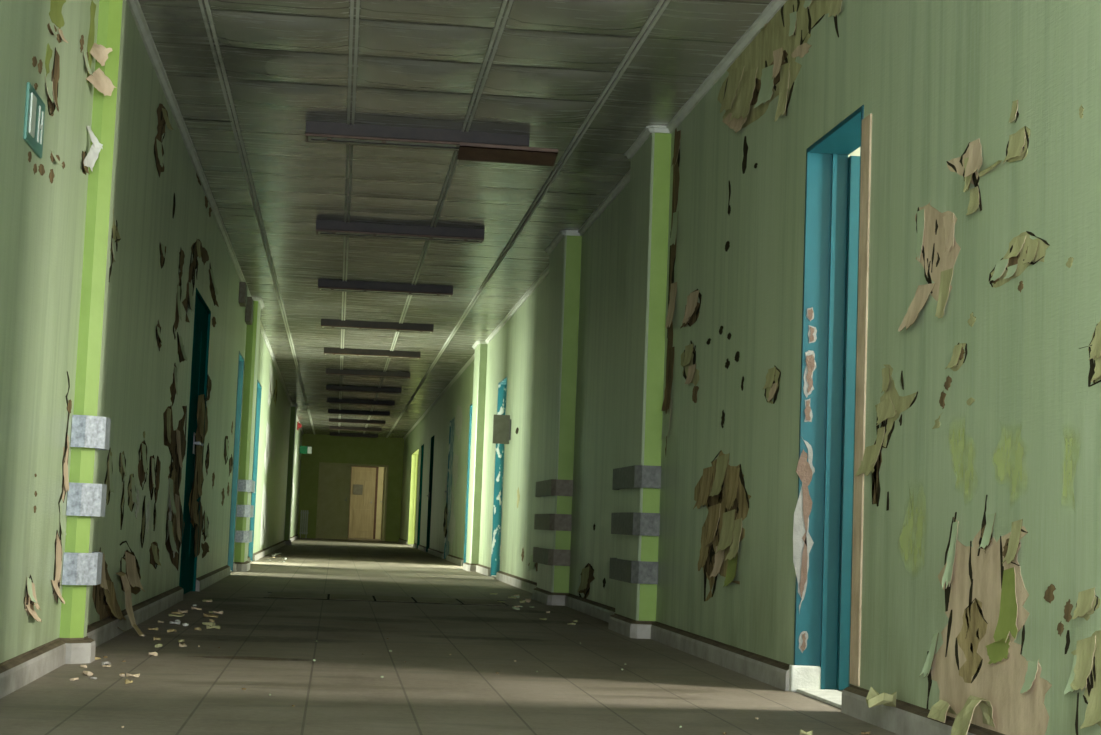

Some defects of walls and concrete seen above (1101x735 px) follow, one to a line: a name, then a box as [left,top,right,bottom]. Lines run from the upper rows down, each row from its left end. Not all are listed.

peeling [32,0,116,116]
peeling [717,0,843,133]
peeling [82,126,103,175]
peeling [898,100,1030,332]
peeling [51,371,72,604]
peeling [92,239,233,631]
peeling [693,450,751,601]
peeling [793,436,815,614]
peeling [803,307,817,422]
peeling [855,364,918,511]
peeling [919,495,1052,735]
peeling [1044,584,1101,735]